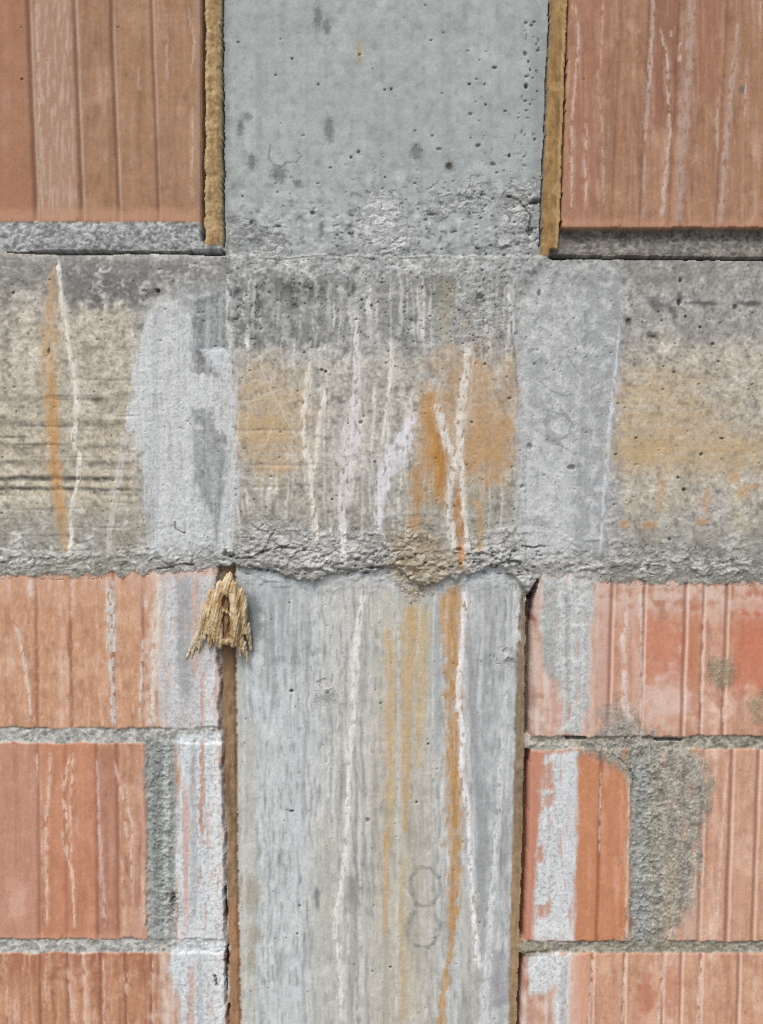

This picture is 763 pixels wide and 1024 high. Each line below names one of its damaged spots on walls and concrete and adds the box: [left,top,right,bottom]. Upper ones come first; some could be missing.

rust [33,263,74,556]
damp [235,270,520,570]
rust [380,388,488,1024]